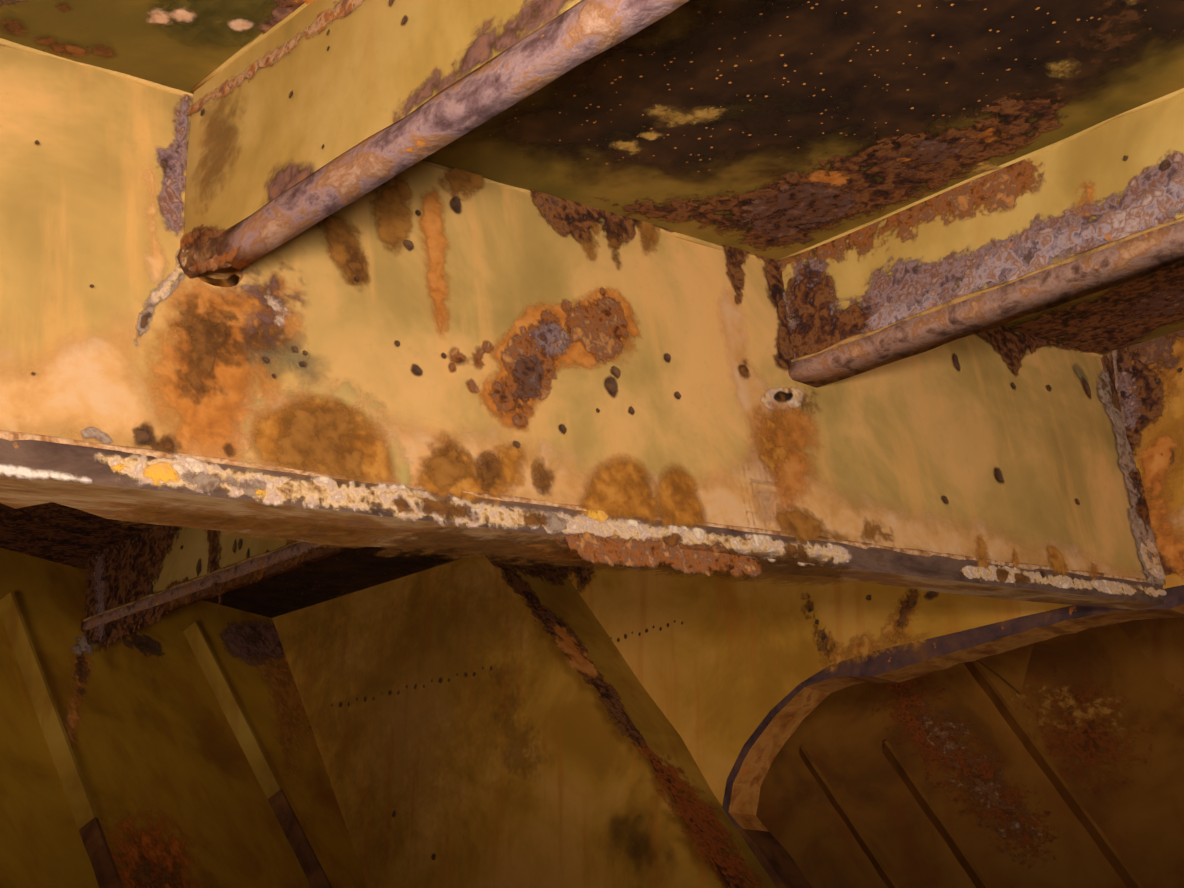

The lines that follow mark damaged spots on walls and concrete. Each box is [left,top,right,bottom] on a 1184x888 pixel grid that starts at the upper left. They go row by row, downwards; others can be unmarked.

leakage [155,0,275,45]
corrosion [133,0,568,506]
hole [450,197,461,213]
corrosion [531,84,1184,369]
corrosion [449,288,639,429]
hole [604,366,621,397]
corrosion [977,263,1184,586]
peeling [81,427,851,565]
corrosion [0,395,938,803]
peeling [960,565,1166,597]
corrosion [79,817,124,888]
corrosion [268,789,332,888]